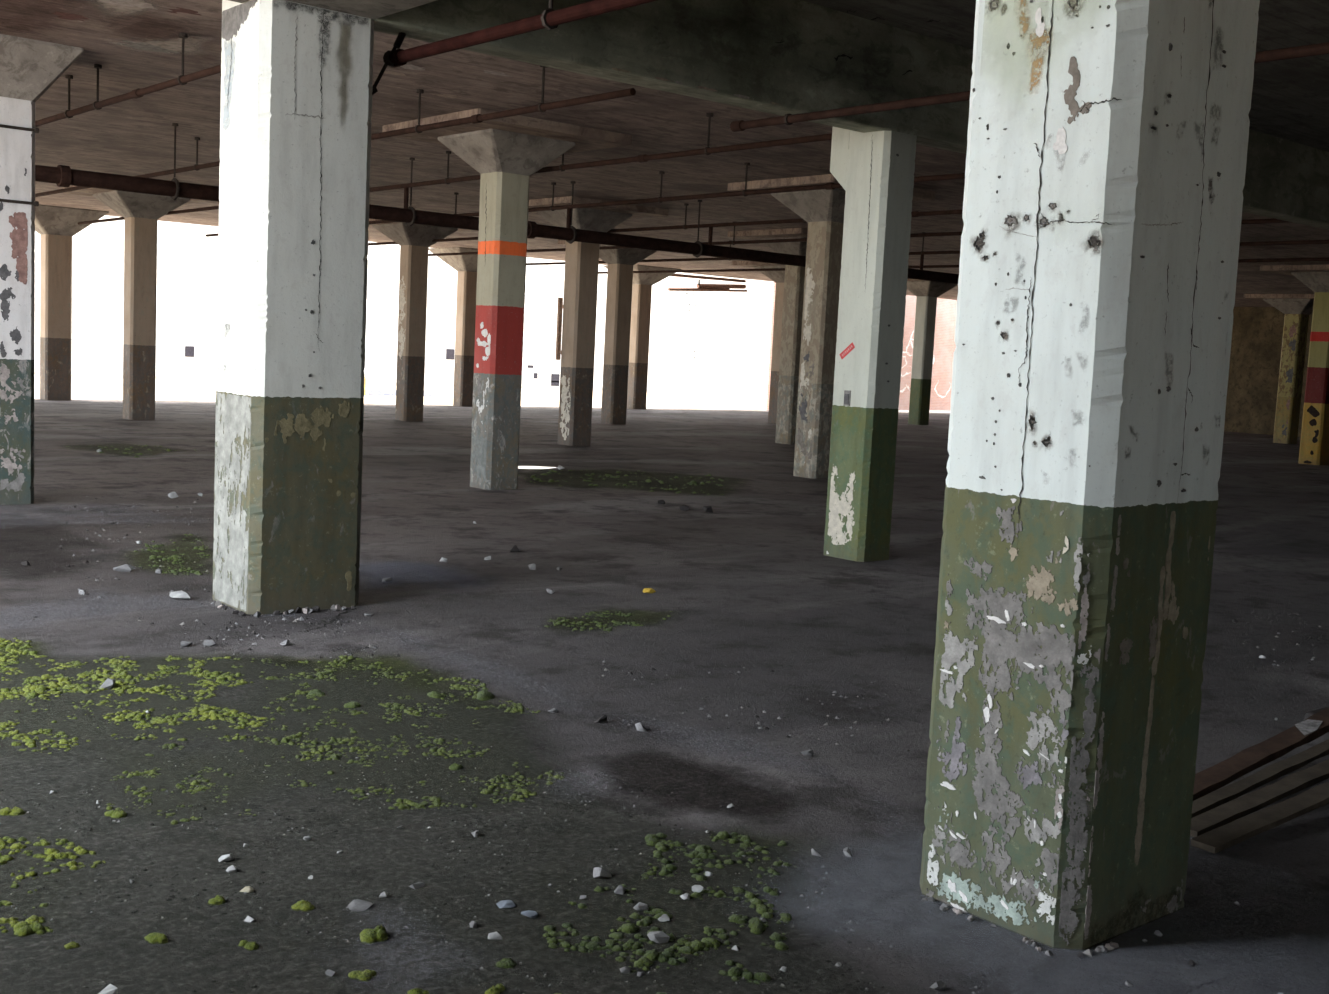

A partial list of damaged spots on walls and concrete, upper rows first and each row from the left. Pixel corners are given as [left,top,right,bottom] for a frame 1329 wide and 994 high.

corrosion [1019,0,1049,90]
peeling [1053,56,1092,154]
peeling [0,185,28,432]
crack [1000,0,1214,552]
peeling [0,448,26,492]
peeling [826,464,856,554]
peeling [996,489,1023,562]
peeling [926,515,1133,946]
peeling [1135,511,1188,865]